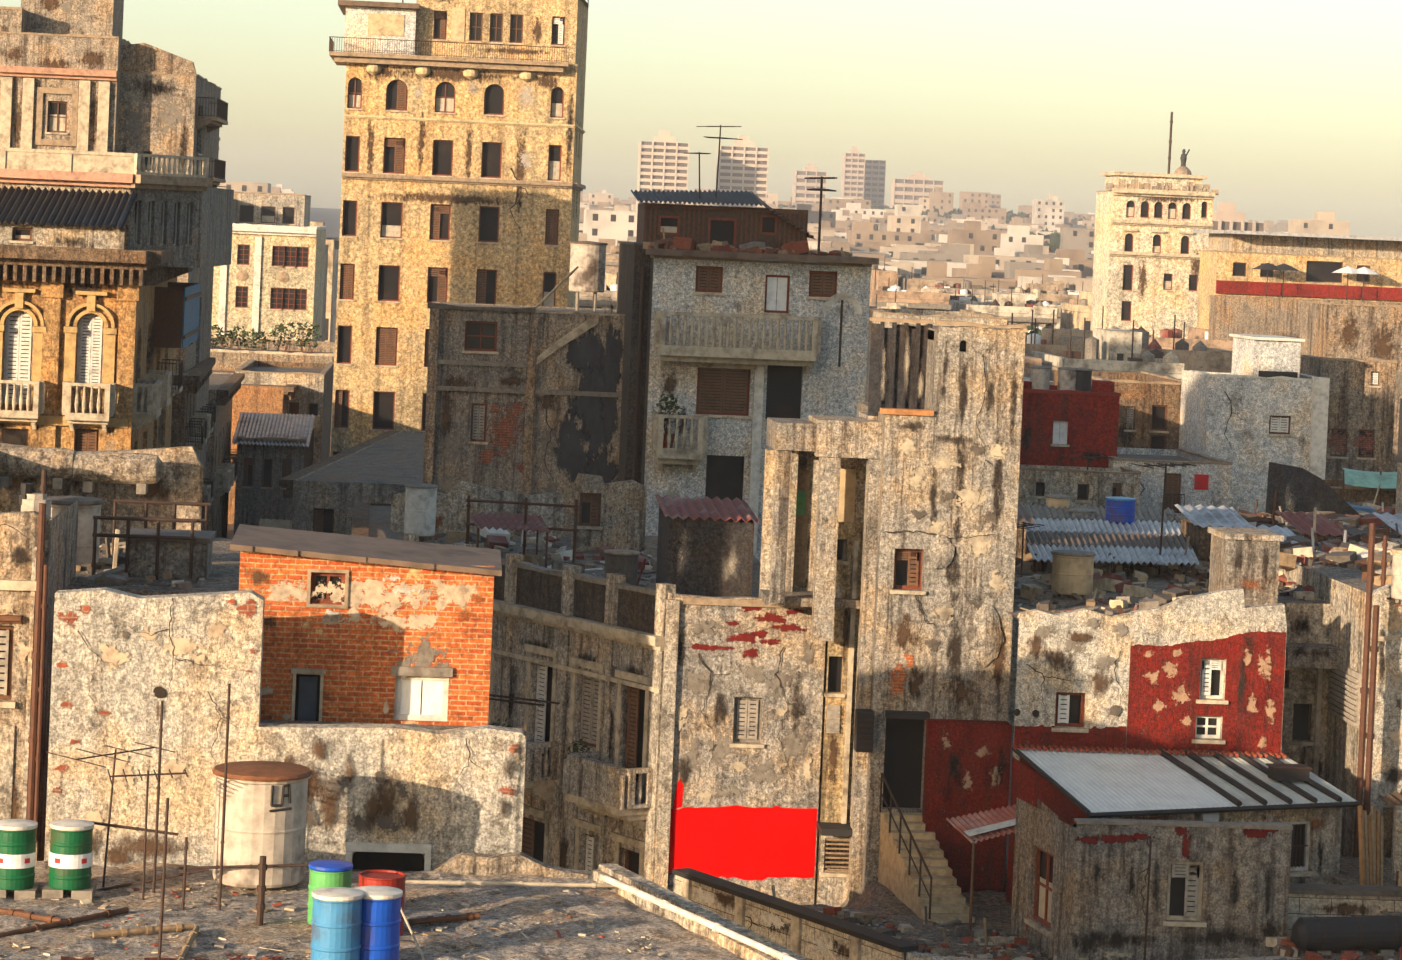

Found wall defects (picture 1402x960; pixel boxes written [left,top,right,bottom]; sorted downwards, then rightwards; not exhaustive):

damp [3,46,104,70]
damp [1009,365,1032,450]
damp [901,356,974,709]
damp [991,459,1004,530]
crack [77,631,110,726]
crack [127,598,240,765]
peeling [99,578,314,670]
peeling [322,579,482,632]
crack [698,653,731,776]
damp [1027,632,1092,672]
peeling [1142,649,1191,726]
peeling [1243,645,1276,748]